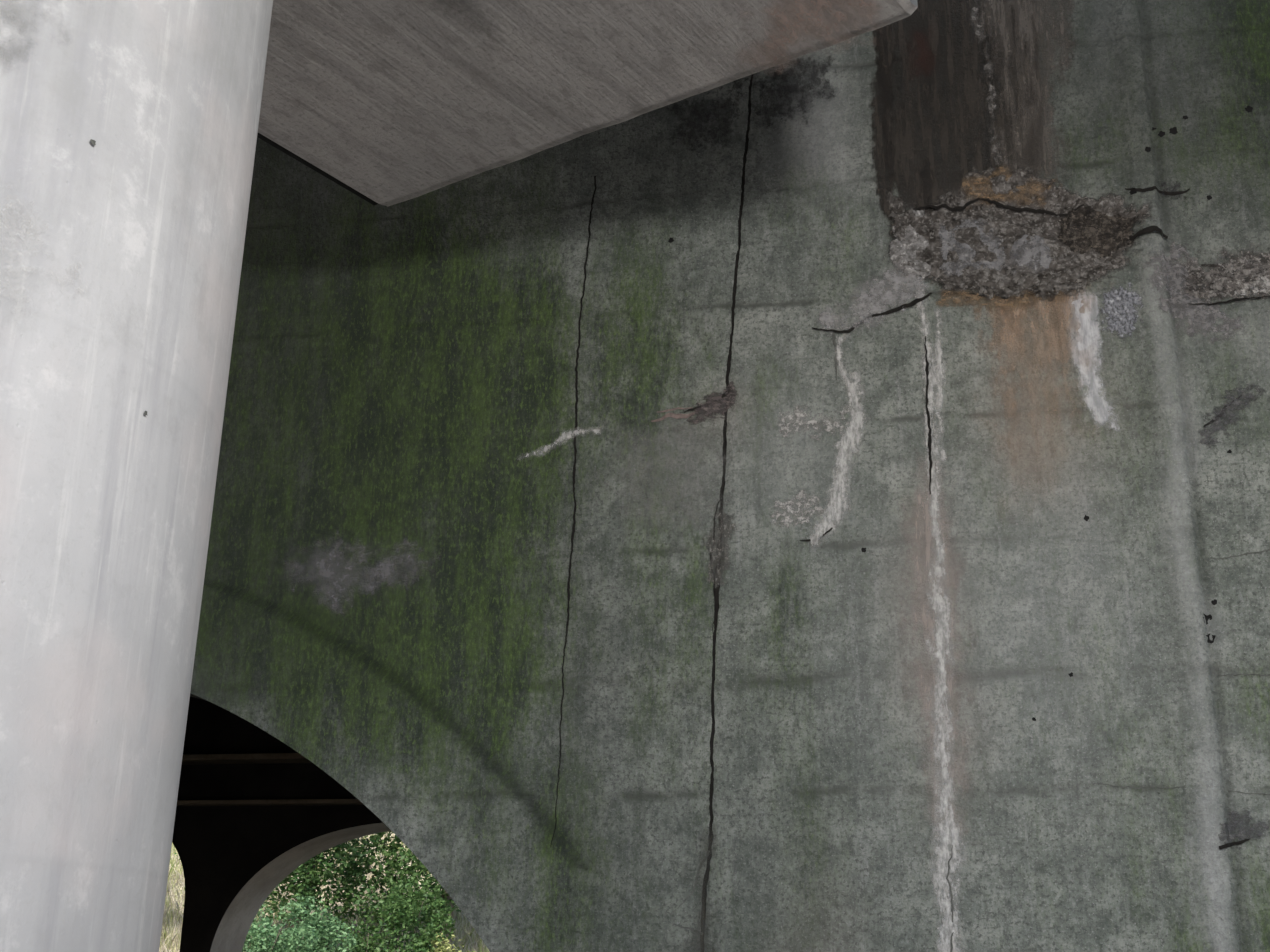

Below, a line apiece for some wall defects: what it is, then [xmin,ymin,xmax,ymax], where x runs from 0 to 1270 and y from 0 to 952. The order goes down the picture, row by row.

leakage [753,57,834,127]
leakage [871,0,1076,240]
spalling [812,166,1270,343]
crack [550,176,596,847]
spalling [651,381,737,424]
crack [673,74,754,952]
leakage [771,332,866,544]
leakage [914,276,963,952]
leakage [1069,293,1116,429]